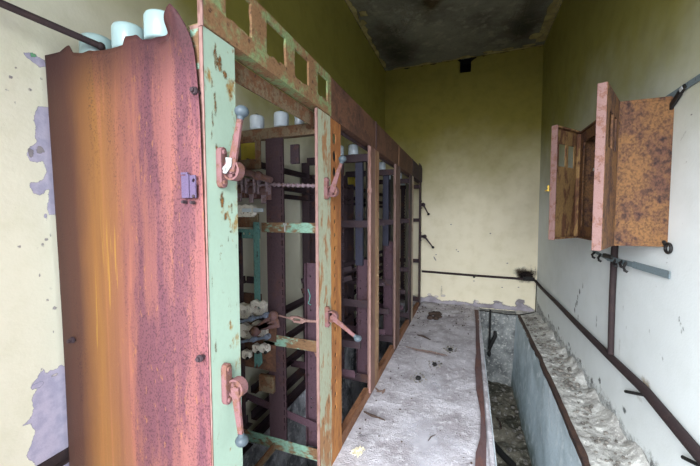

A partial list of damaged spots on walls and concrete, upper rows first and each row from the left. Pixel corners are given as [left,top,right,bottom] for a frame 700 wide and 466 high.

peeling [24,53,46,67]
peeling [27,106,55,218]
peeling [23,365,68,465]